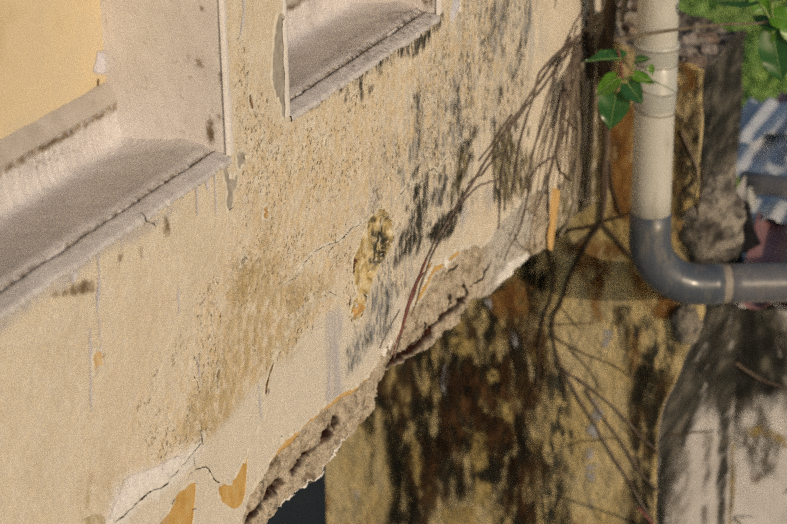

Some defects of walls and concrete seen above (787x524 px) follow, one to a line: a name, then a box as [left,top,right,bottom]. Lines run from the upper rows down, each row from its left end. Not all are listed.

peeling [108,270,224,524]
crack [106,424,233,524]
leakage [291,0,443,101]
leakage [348,285,399,372]
spalling [216,183,560,524]
leakage [394,82,479,267]
leakage [365,257,573,524]
leakage [492,121,534,210]
leakage [512,0,532,78]
leakage [556,40,600,229]
leakage [613,303,787,524]
leakage [723,245,743,264]